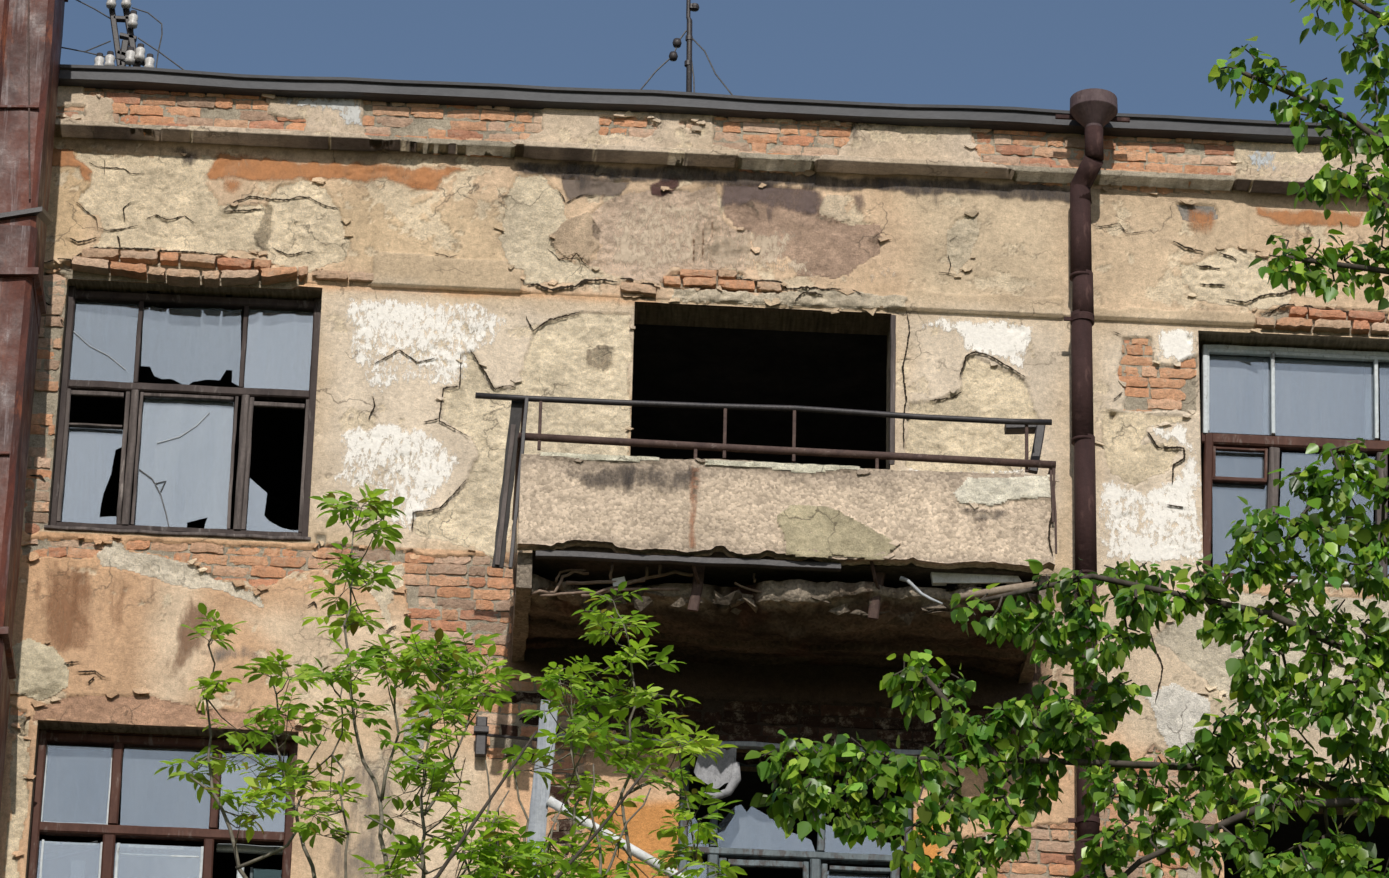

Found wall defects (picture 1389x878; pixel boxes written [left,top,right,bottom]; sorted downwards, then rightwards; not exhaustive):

crack [44,160,312,263]
crack [224,196,337,212]
flaking render [56,87,907,316]
flaking render [947,210,979,278]
crack [1098,223,1349,316]
flaking render [906,317,1039,474]
peeling [1095,328,1203,564]
flaking render [4,150,635,878]
spalling [530,563,694,597]
flaking render [608,691,1026,768]